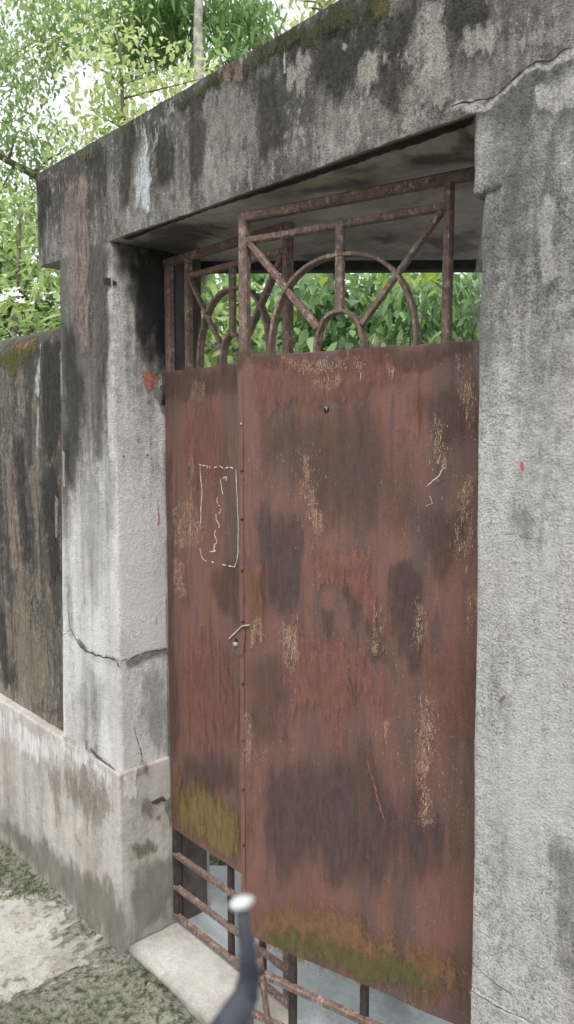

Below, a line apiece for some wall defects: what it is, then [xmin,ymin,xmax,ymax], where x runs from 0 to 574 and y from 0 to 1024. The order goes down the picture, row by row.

leakage [255,28,302,159]
leakage [315,0,417,113]
crack [450,47,574,112]
leakage [35,66,574,588]
leakage [13,438,29,560]
leakage [0,608,17,687]
crack [60,570,168,668]
leakage [0,707,137,800]
leakage [3,822,174,948]